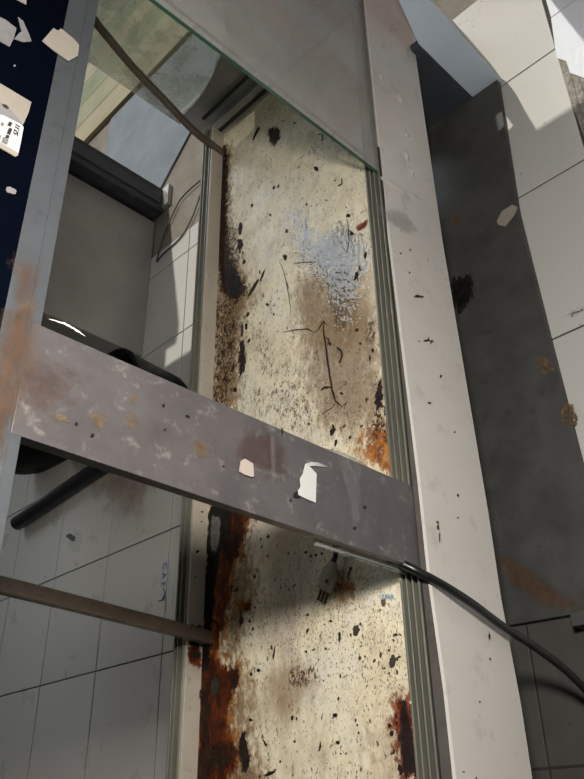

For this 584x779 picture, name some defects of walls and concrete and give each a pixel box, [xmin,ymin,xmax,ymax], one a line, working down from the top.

crack [280,264,342,414]
corrosion [347,421,391,475]
corrosion [188,512,262,779]